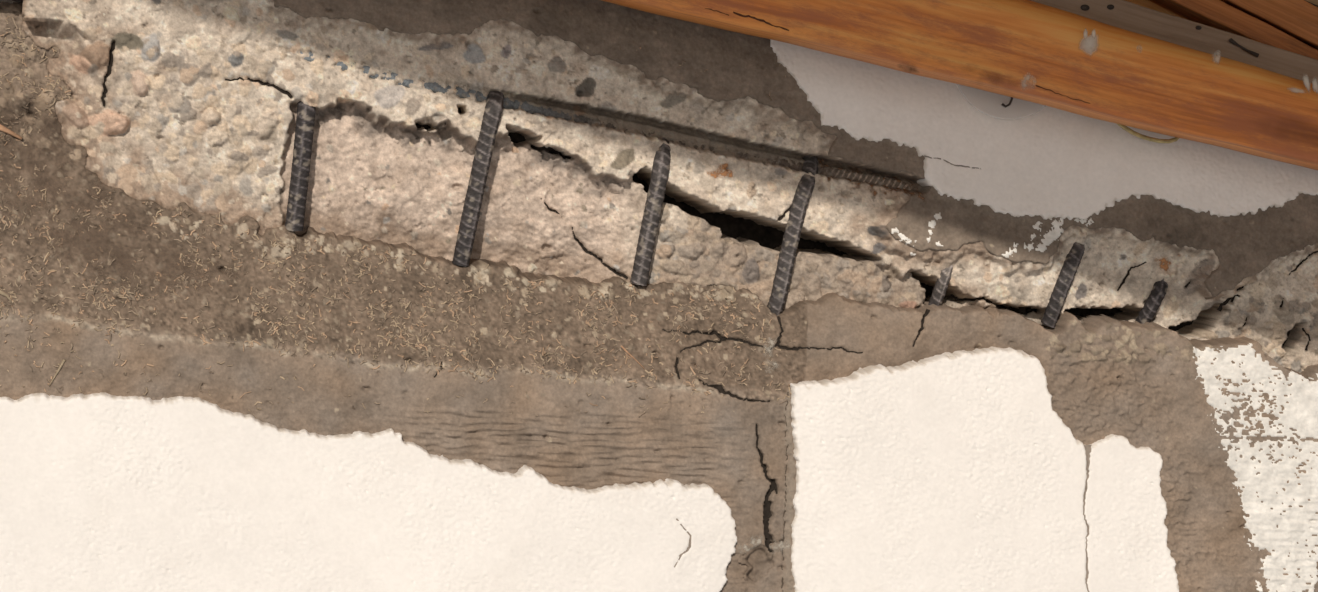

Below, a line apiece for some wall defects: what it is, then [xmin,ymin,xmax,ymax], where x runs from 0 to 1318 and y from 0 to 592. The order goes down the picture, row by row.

spalling [22,0,1064,310]
crack [530,145,571,159]
crack [541,198,628,279]
crack [632,174,847,256]
crack [662,316,863,591]
crack [1083,445,1091,592]